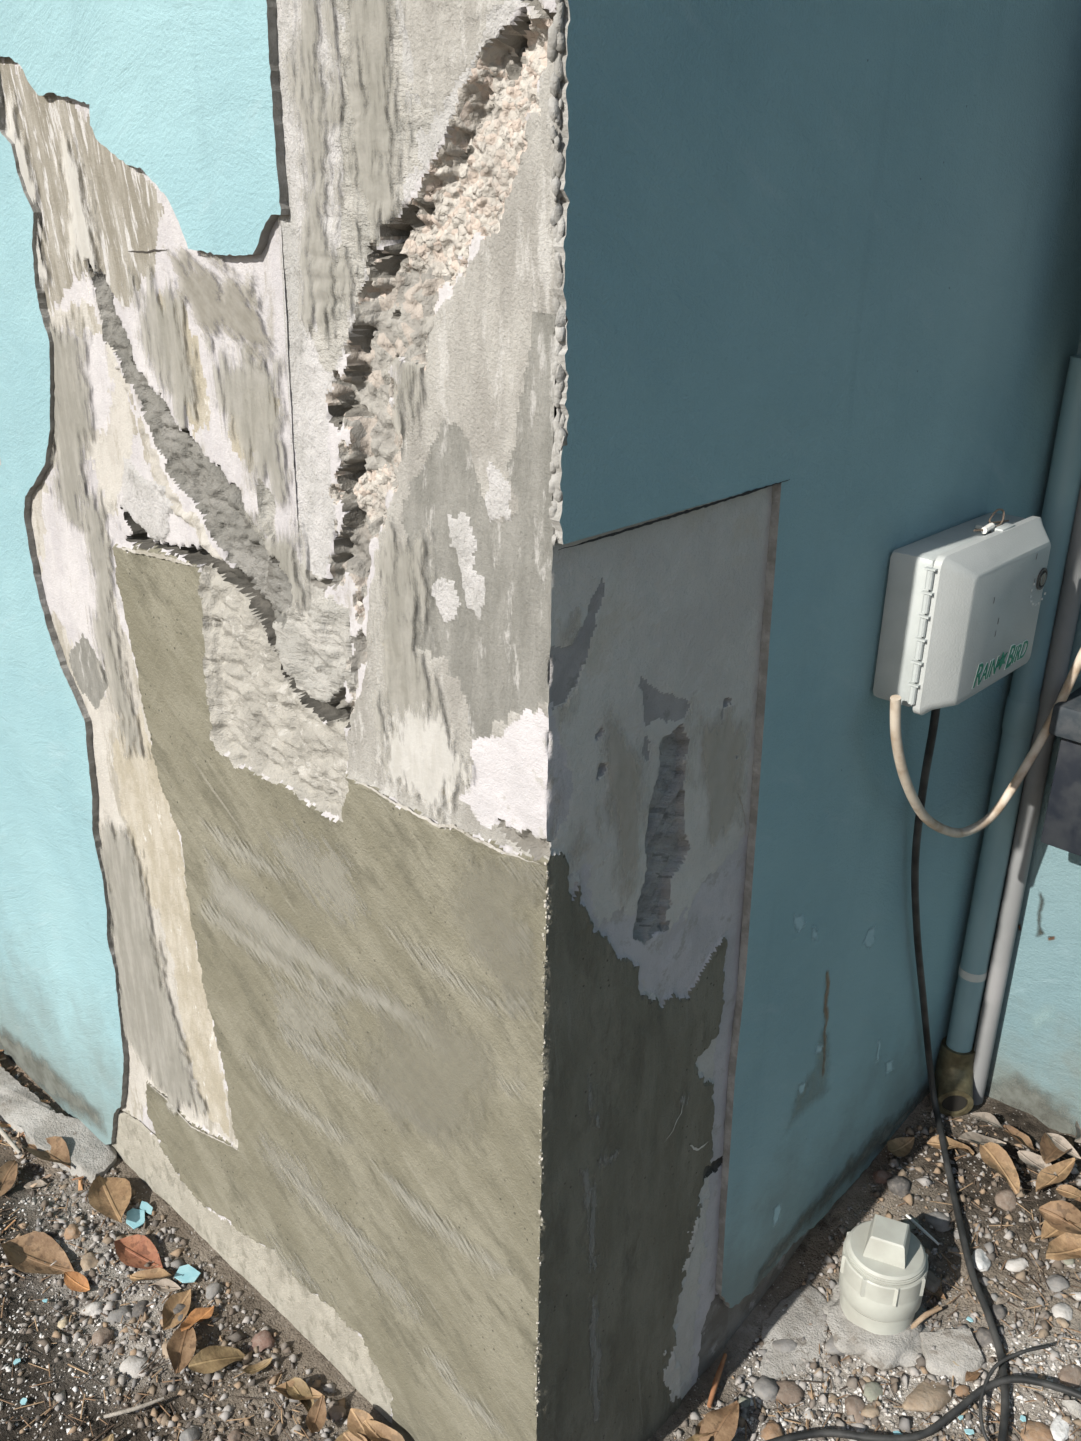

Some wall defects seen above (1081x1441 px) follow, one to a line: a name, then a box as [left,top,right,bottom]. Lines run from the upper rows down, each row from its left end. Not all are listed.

peeling [0,0,772,1441]